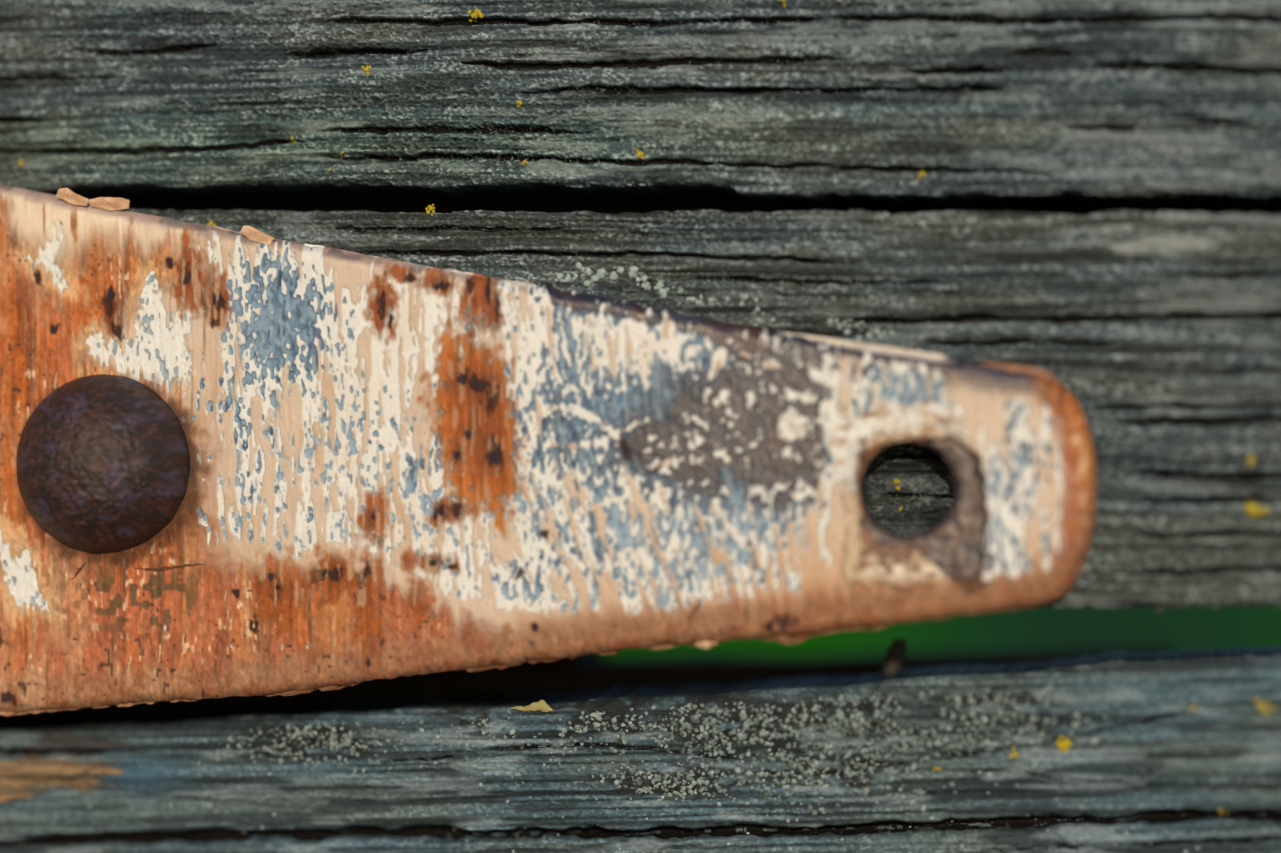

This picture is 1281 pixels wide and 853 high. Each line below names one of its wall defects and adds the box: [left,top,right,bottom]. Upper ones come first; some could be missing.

rust [0,195,1096,716]
peeling [85,226,1065,616]